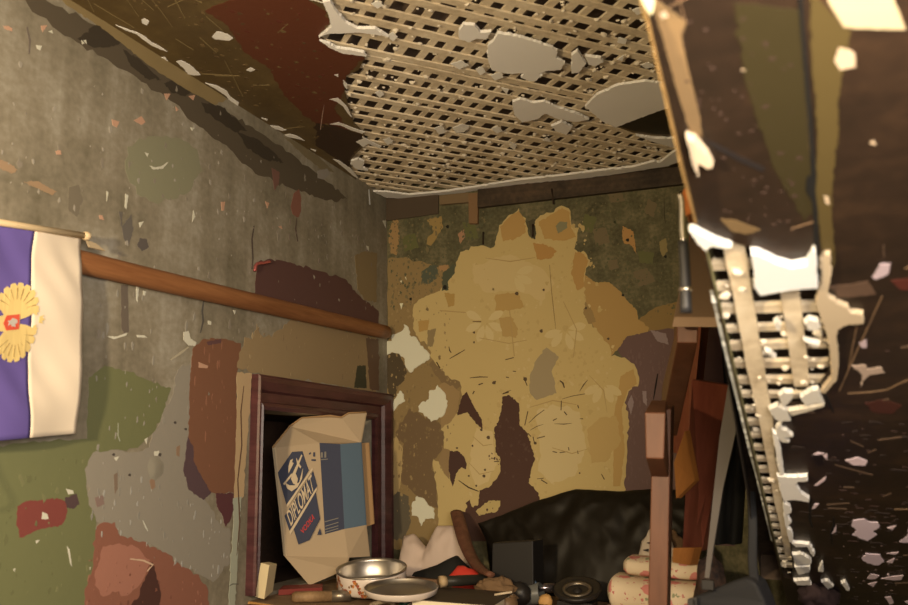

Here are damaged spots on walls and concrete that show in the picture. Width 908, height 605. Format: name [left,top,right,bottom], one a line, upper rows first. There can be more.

peeling [205,0,760,259]
flaking render [255,257,462,482]
flaking render [756,250,865,416]
peeling [851,364,885,386]
peeling [183,320,376,605]
spalling [710,270,793,580]
peeling [845,457,867,466]
peeling [16,489,74,544]
peeling [84,522,209,605]
flaking render [394,482,439,550]
peeling [851,519,896,541]
peeling [861,534,908,587]